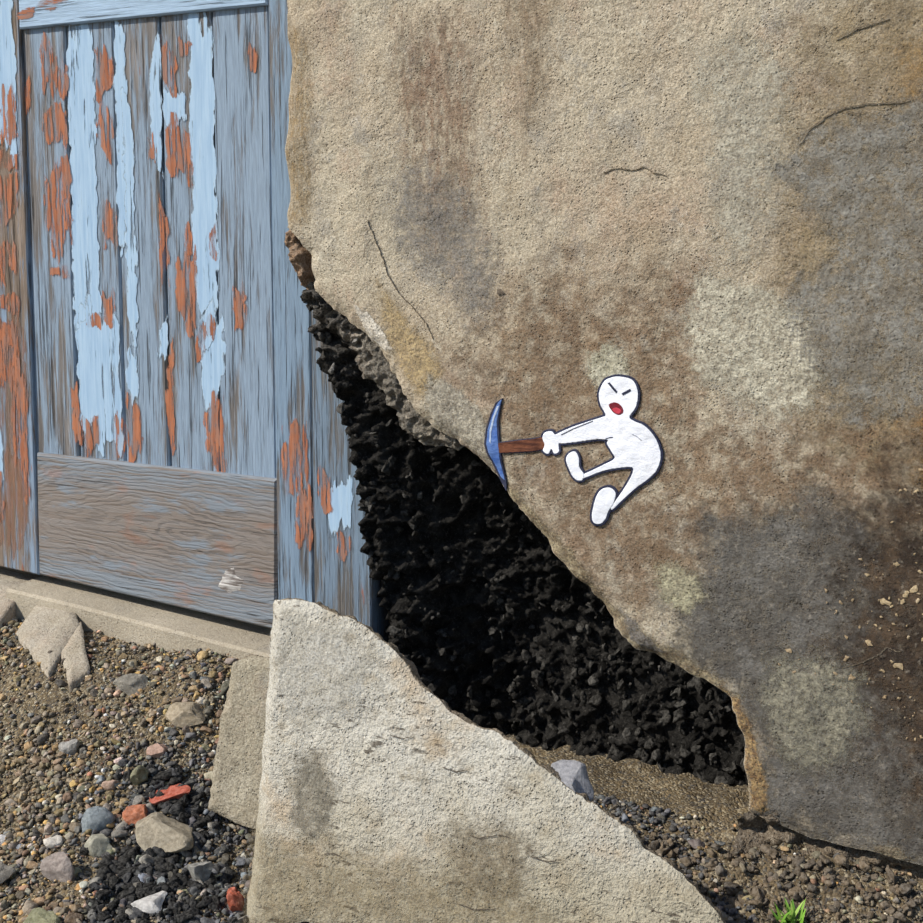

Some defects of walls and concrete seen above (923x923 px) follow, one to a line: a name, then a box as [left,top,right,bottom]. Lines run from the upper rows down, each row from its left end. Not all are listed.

peeling [0,0,62,226]
peeling [248,42,258,73]
crack [603,162,668,178]
crack [799,100,911,145]
peeling [39,20,143,463]
peeling [147,12,247,472]
crack [363,219,433,339]
damp [478,32,923,865]
spalling [275,230,768,923]
flaking render [858,585,920,639]
flaking render [880,660,923,741]